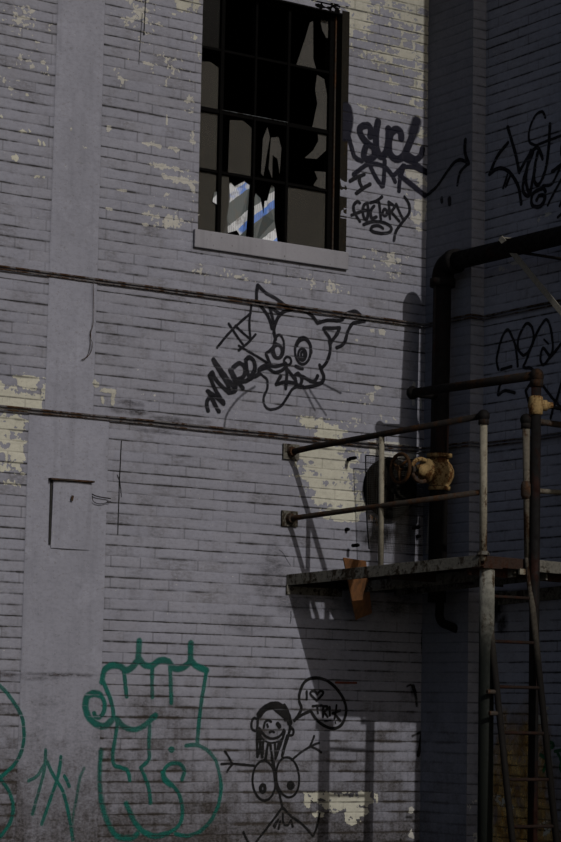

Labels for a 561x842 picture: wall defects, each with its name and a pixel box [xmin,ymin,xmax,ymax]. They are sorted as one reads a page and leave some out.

peeling [120,0,195,87]
peeling [172,0,201,16]
peeling [142,162,199,236]
peeling [0,372,46,488]
peeling [289,415,423,523]
peeling [303,791,378,826]